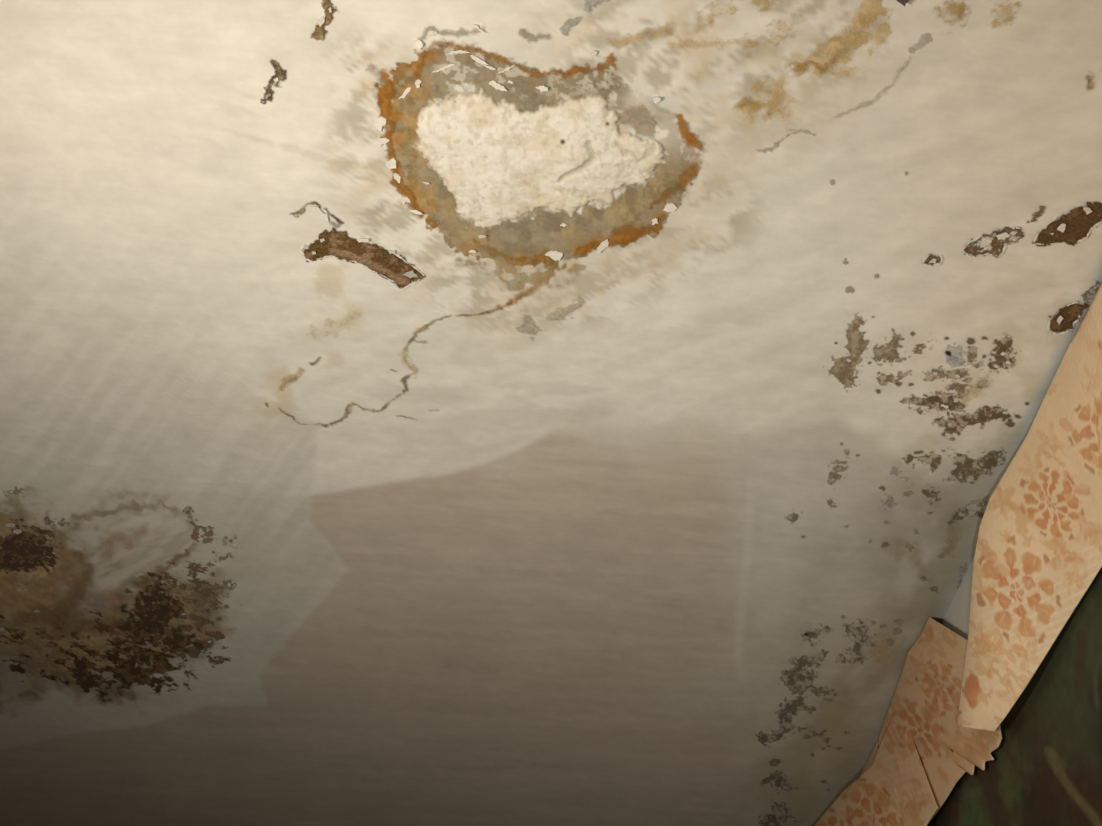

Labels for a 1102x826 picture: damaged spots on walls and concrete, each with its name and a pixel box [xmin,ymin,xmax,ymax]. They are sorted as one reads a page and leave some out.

flaking render [311,0,336,41]
flaking render [261,60,286,104]
flaking render [291,202,425,290]
flaking render [921,254,943,267]
flaking render [963,202,1102,259]
flaking render [1047,281,1101,335]
crack [265,312,353,419]
crack [322,308,502,427]
peeling [828,313,1029,514]
damp [0,486,236,701]
peeling [756,615,901,756]
peeling [759,759,797,826]